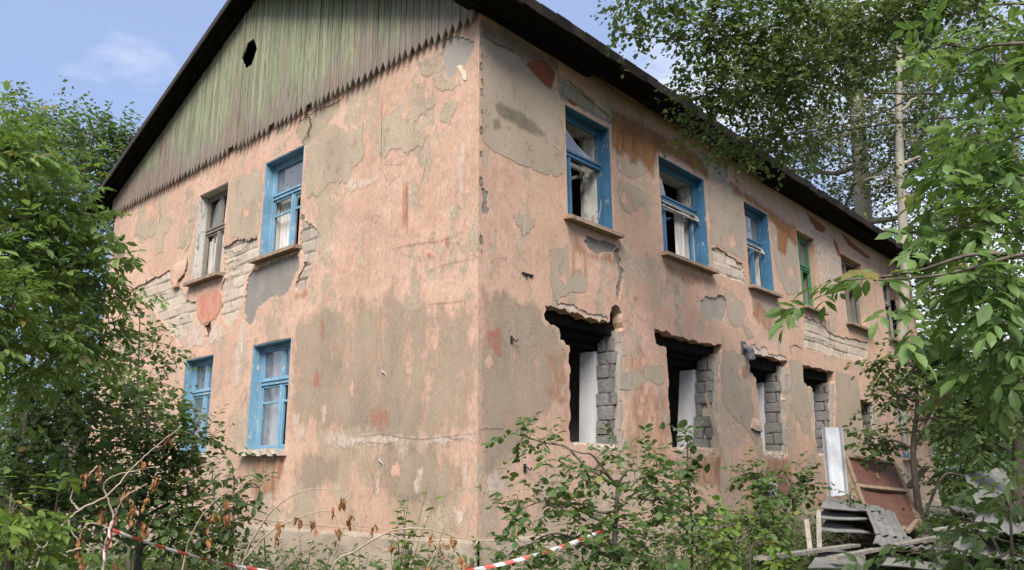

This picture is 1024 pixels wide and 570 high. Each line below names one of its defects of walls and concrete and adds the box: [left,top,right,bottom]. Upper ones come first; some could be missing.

peeling [133,169,320,345]